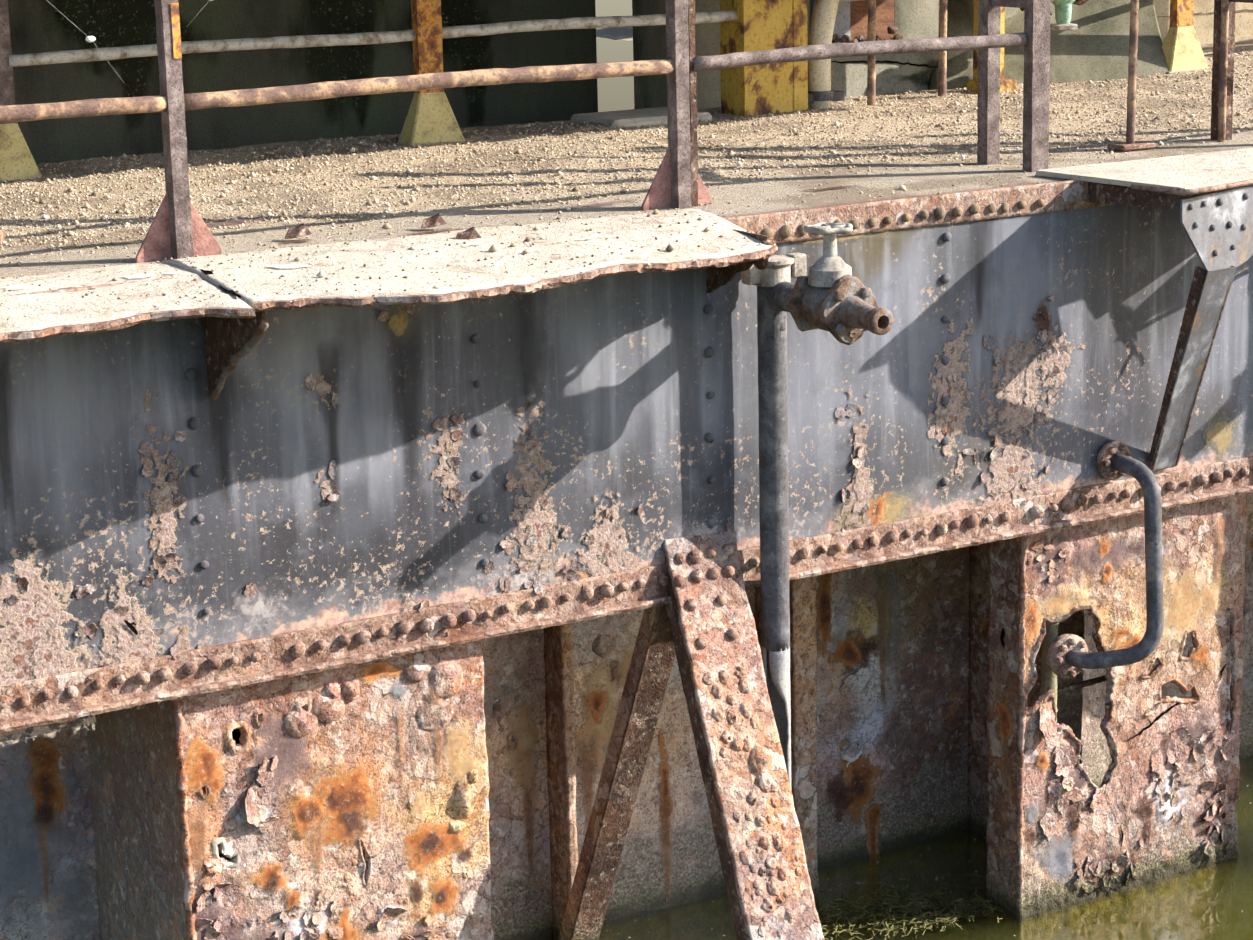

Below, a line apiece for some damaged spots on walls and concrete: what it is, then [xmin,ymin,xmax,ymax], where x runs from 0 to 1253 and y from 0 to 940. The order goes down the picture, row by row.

peeling [0,388,212,686]
peeling [418,397,470,516]
peeling [478,387,644,596]
peeling [834,390,882,533]
peeling [927,295,1085,506]
rust [1022,535,1145,681]
rust [24,727,66,901]
rust [250,864,371,940]
rust [256,718,378,869]
rust [393,793,476,938]
rust [702,665,814,939]
spalling [1037,700,1110,841]